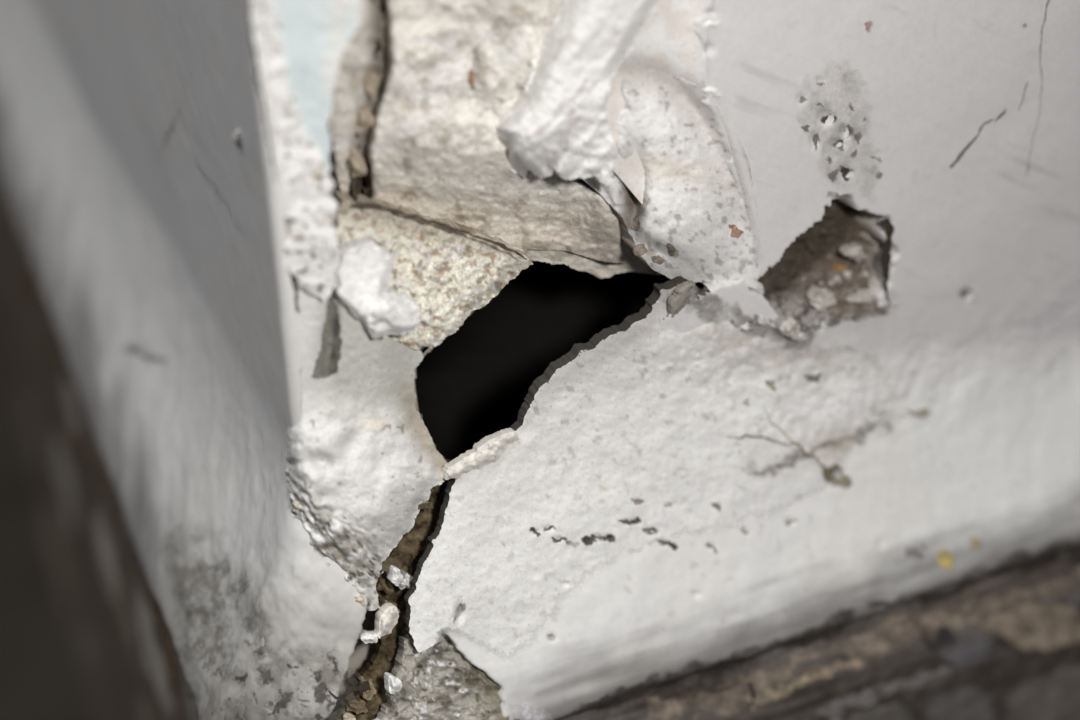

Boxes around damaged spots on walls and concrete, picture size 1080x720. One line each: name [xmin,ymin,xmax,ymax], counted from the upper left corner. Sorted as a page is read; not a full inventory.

crack [345,0,527,260]
spalling [688,66,900,348]
crack [949,0,1051,176]
spalling [260,0,662,720]
crack [727,381,852,488]
crack [804,373,822,382]
crack [907,409,931,418]
peeling [167,543,358,720]
crack [329,459,452,720]
spalling [619,498,678,550]